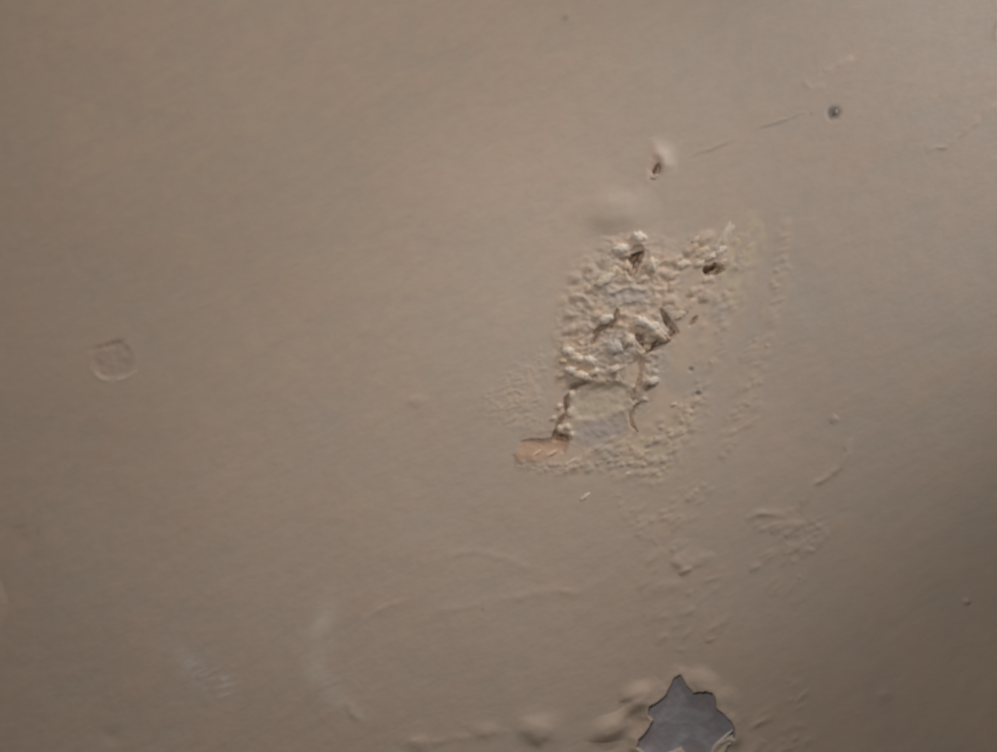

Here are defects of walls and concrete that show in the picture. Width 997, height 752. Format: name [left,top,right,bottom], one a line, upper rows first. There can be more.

hole [632,132,704,192]
flaking render [489,202,774,504]
spalling [567,661,749,752]